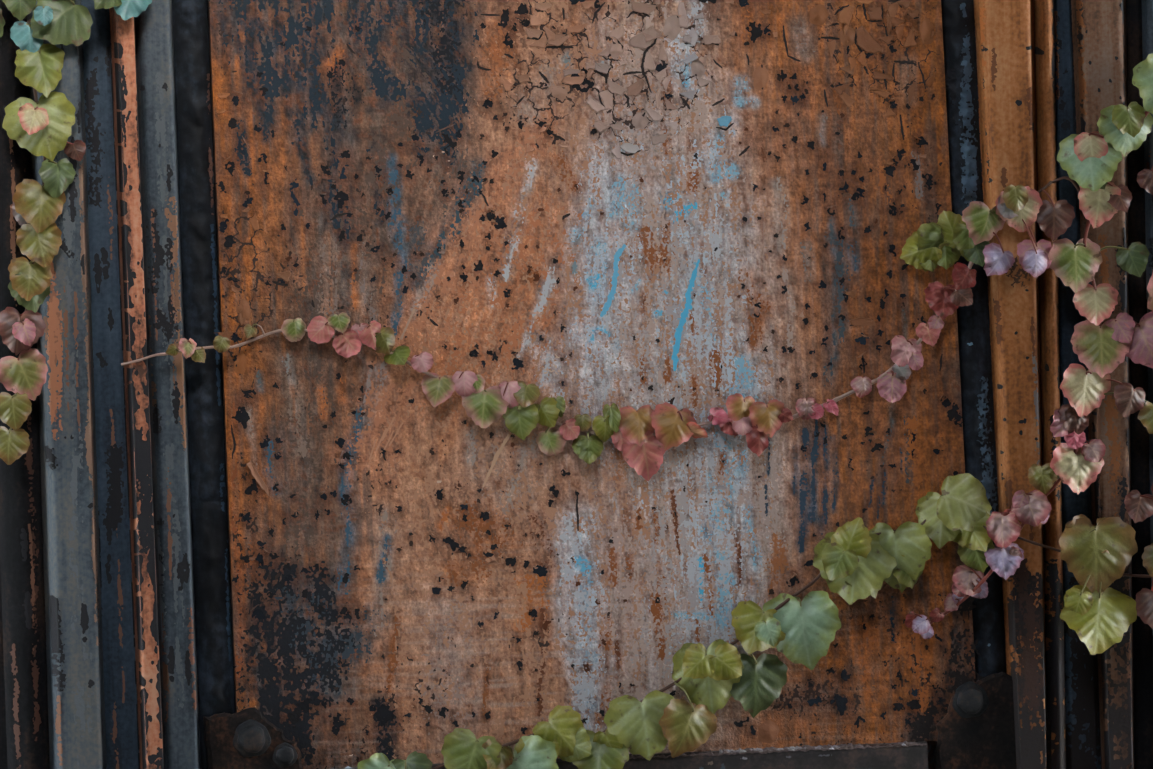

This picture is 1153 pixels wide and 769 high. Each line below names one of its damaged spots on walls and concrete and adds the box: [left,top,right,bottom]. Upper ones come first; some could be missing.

rust [43,158,100,646]
rust [149,196,186,450]
rust [208,138,304,388]
peeling [429,0,851,730]
rust [630,220,675,280]
rust [690,350,722,409]
rust [626,489,681,555]
rust [343,615,450,765]
rust [437,478,574,717]
rust [583,599,621,724]
rust [649,561,667,661]
rust [694,554,714,642]